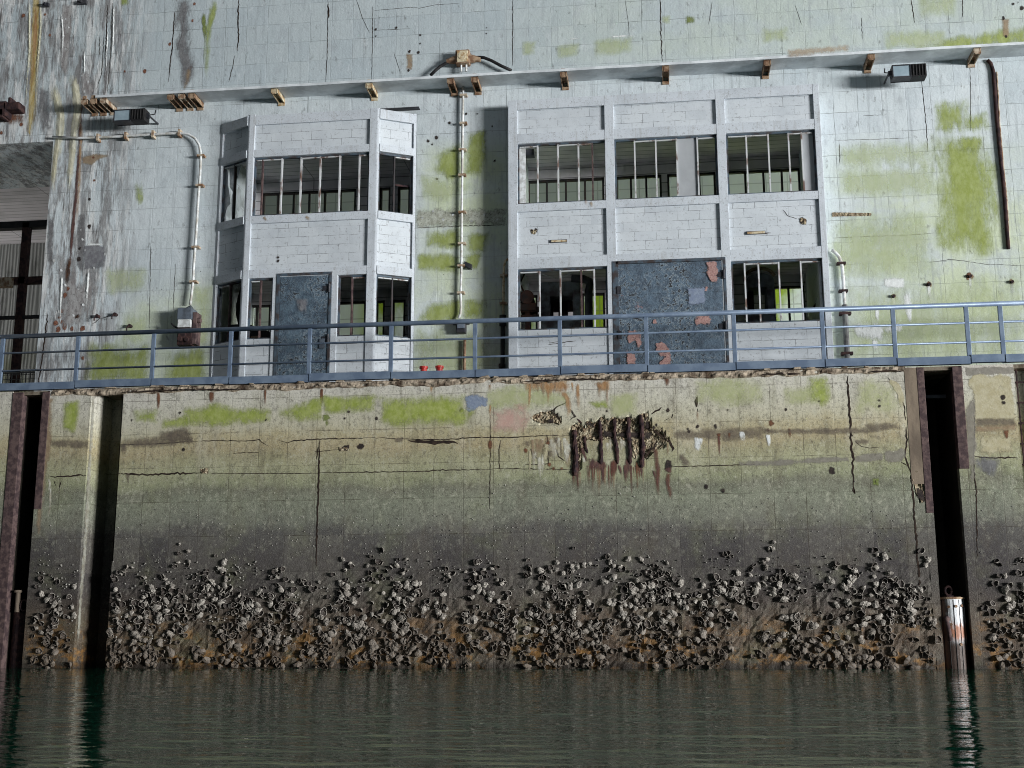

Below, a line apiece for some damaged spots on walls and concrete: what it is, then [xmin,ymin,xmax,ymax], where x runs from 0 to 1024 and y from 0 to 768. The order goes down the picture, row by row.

rust [53,100,106,332]
peeling [688,261,718,325]
rust [527,381,579,409]
crack [119,435,572,566]
spalling [531,402,673,476]
rust [573,448,672,496]
crack [662,431,747,467]
crack [846,377,855,493]